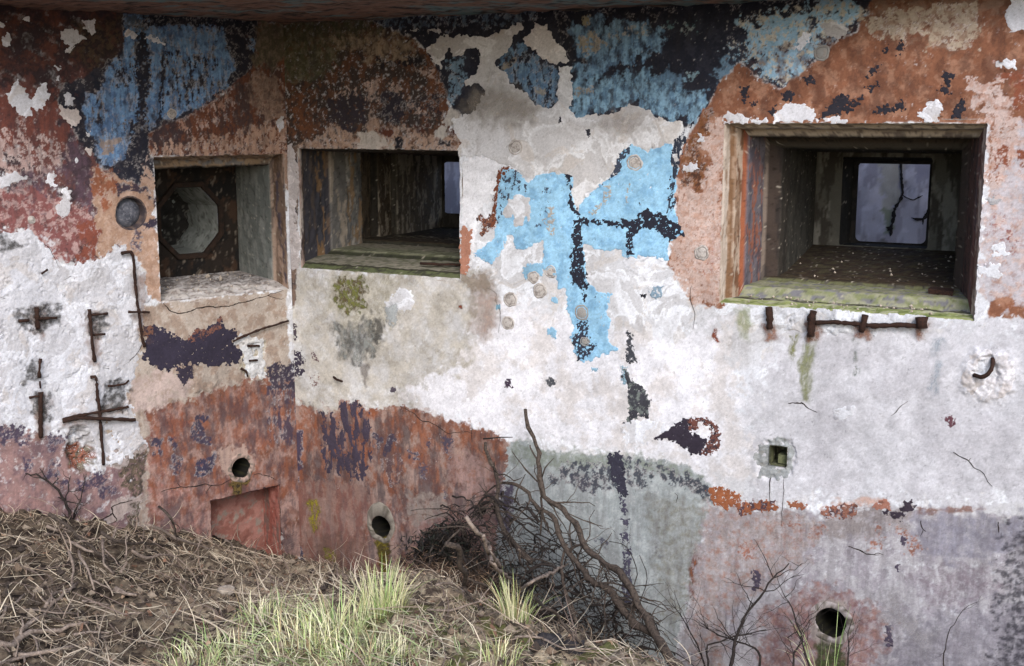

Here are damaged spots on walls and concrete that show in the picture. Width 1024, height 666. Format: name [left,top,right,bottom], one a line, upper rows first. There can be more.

peeling [60,19,96,53]
peeling [6,65,92,163]
peeling [722,39,905,125]
peeling [0,171,33,189]
peeling [45,171,72,219]
spalling [276,113,302,270]
spalling [0,229,320,467]
crack [163,290,284,314]
peeling [405,22,722,603]
leakage [798,345,813,400]
rust [64,442,97,473]
peeling [319,399,374,482]